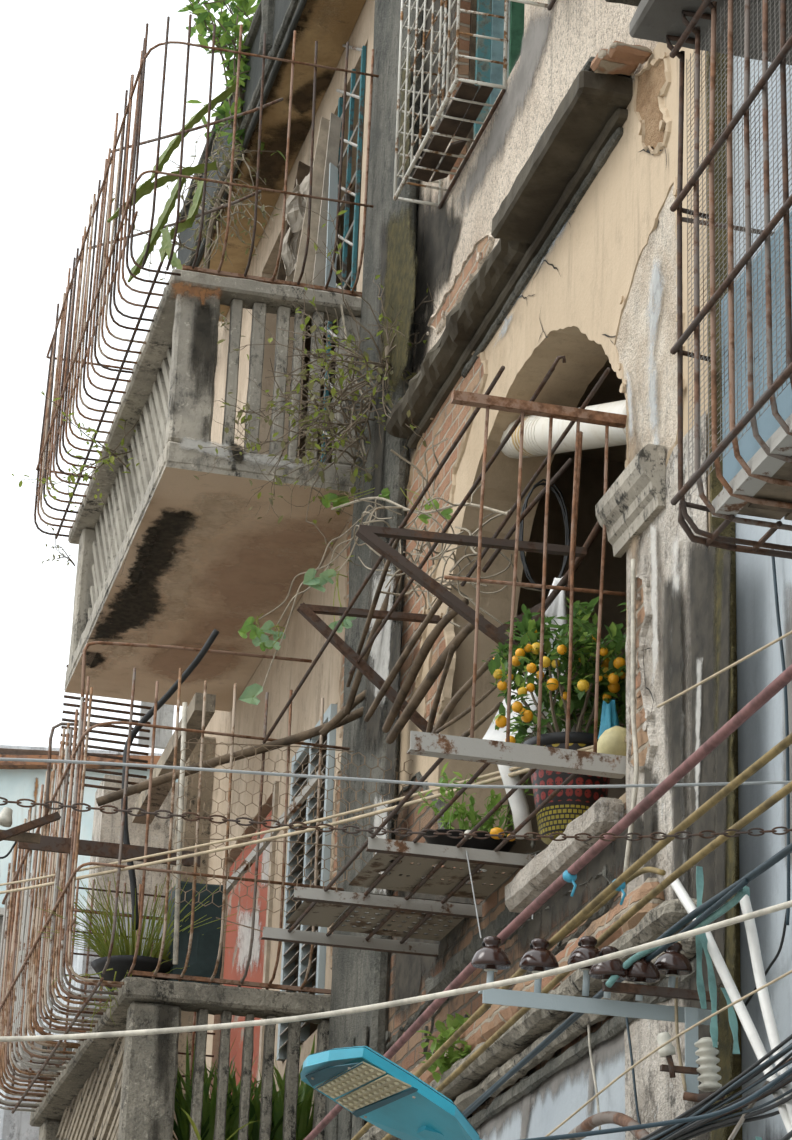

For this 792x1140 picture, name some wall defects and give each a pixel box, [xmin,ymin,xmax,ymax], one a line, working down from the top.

damp [213,0,334,238]
flaking render [631,52,672,156]
spalling [427,232,495,335]
damp [86,495,246,670]
flaking render [399,351,488,732]